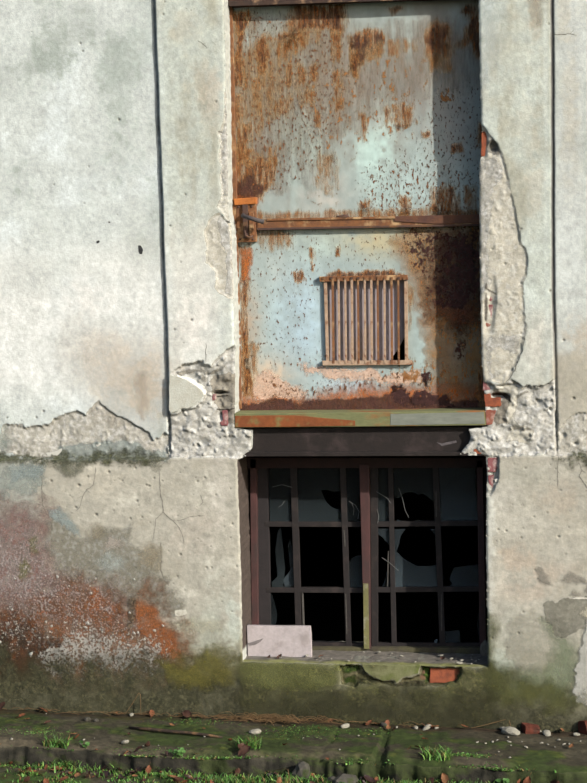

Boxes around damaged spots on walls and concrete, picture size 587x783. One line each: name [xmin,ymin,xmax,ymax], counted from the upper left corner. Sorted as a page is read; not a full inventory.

rust [233,2,482,219]
spalling [204,89,234,299]
rust [238,226,485,410]
spalling [437,126,587,496]
spalling [0,345,252,463]
crack [153,472,204,584]
peeling [536,567,550,584]
peeling [543,573,587,637]
spalling [339,661,463,687]
water stain [573,627,587,705]